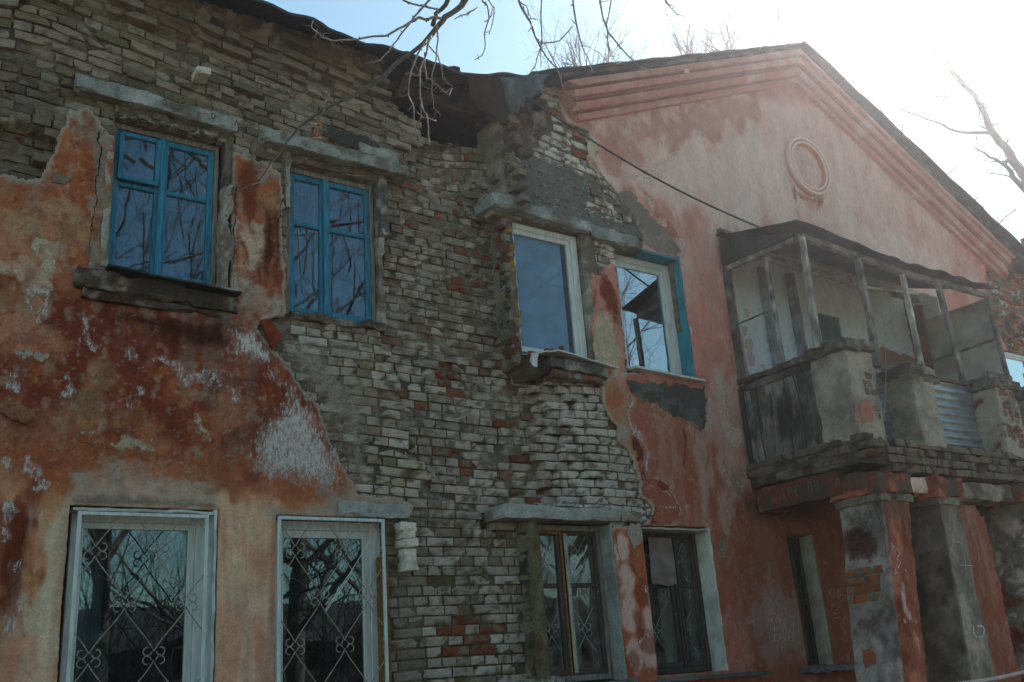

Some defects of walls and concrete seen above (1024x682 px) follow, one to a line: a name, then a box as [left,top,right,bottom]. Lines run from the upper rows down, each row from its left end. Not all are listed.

crack [88,132,104,262]
leakage [121,314,223,344]
leakage [236,330,274,379]
spalling [0,0,687,682]
leakage [250,389,336,482]
leakage [2,501,15,542]
spalling [844,527,883,604]